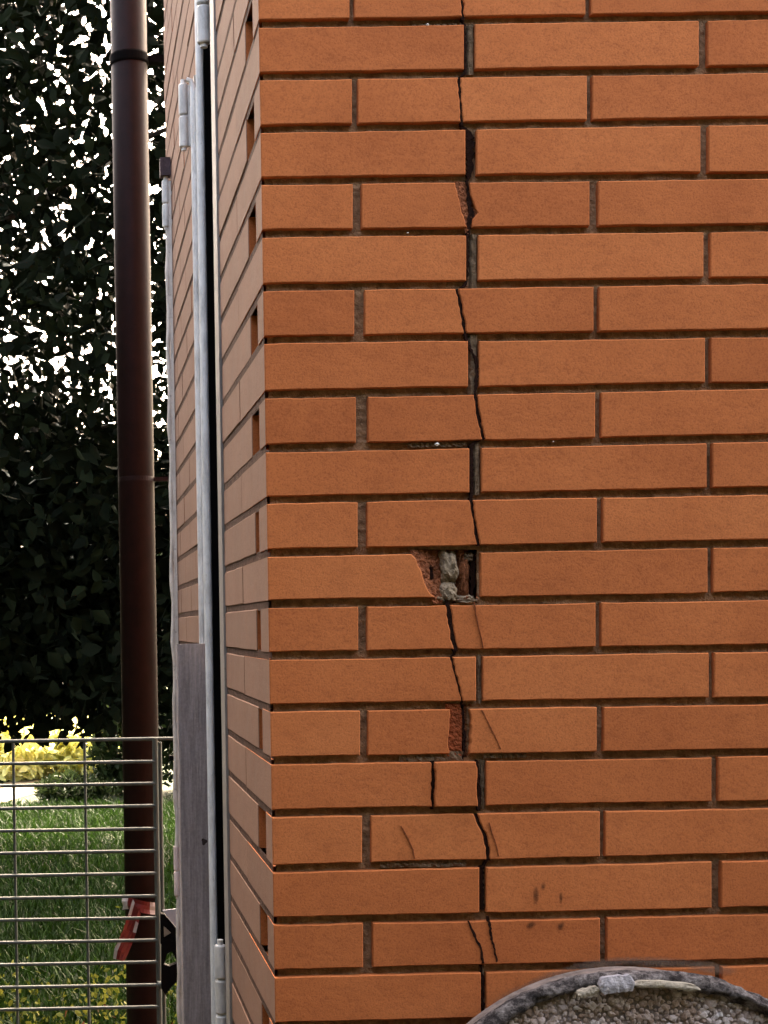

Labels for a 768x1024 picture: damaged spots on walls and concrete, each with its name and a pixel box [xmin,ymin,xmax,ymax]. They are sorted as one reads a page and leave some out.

crack [456,0,485,546]
spalling [409,550,478,604]
spalling [445,704,472,759]
crack [443,599,501,749]
crack [468,759,499,1011]